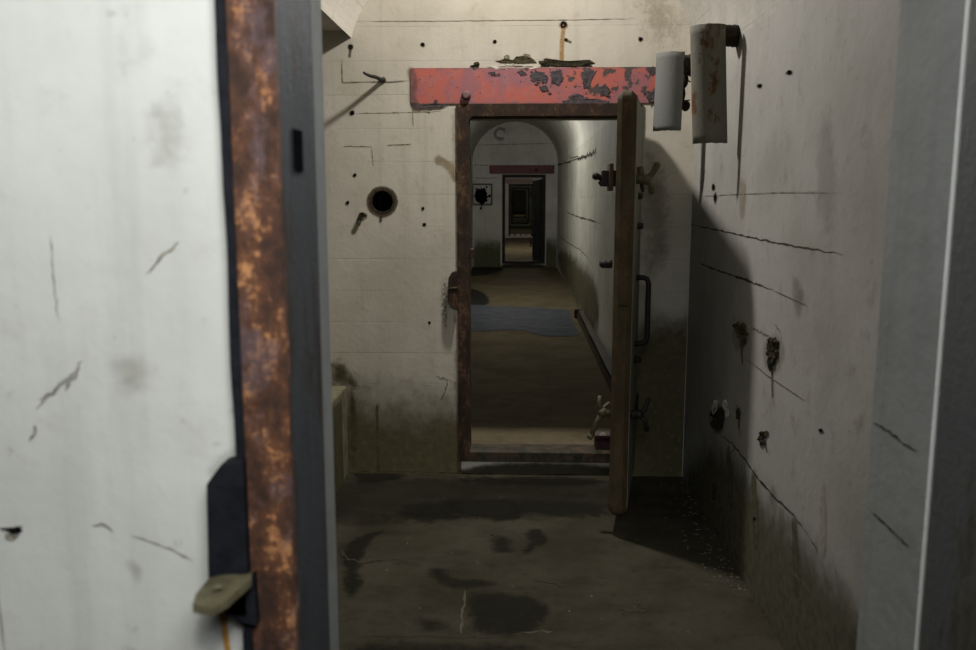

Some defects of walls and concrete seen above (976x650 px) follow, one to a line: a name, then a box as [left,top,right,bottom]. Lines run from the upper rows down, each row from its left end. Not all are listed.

peeling [412,100,448,111]
spalling [471,53,613,103]
crack [702,264,805,305]
spalling [765,337,779,397]
damp [331,364,609,496]
spalling [756,431,769,452]
crack [875,423,917,451]
damp [632,322,858,650]
crack [719,433,817,551]
crack [93,522,193,561]
damp [343,532,379,594]
damp [433,569,547,634]